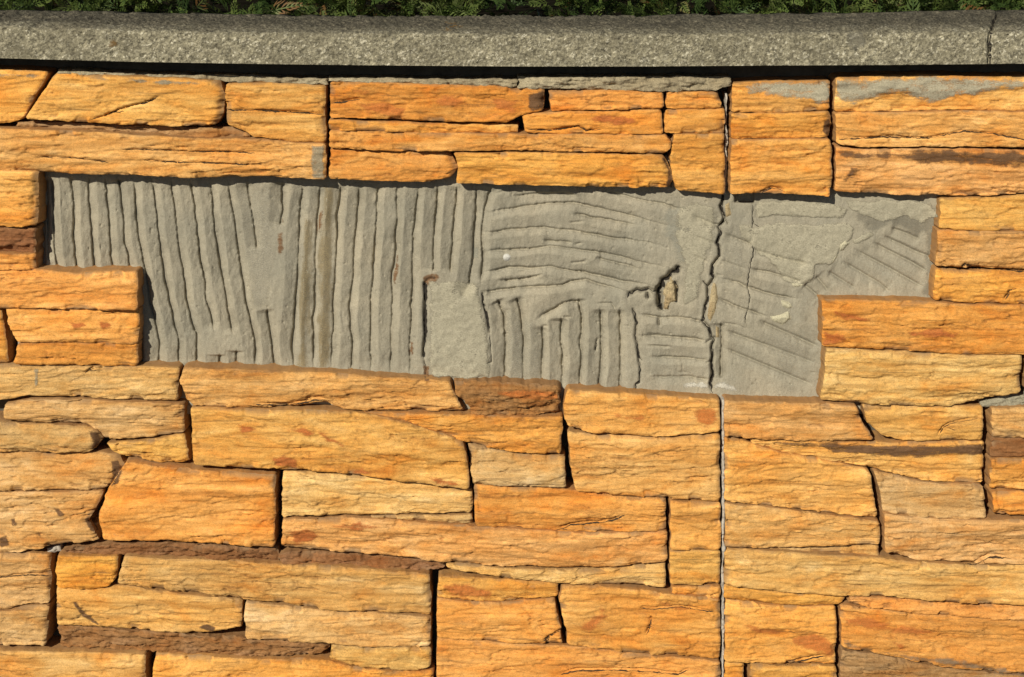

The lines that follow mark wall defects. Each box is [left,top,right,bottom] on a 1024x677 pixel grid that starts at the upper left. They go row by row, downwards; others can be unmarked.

crack [987,15,997,64]
peeling [755,200,847,218]
spalling [662,276,678,310]
spalling [707,282,719,337]
crack [702,187,781,393]